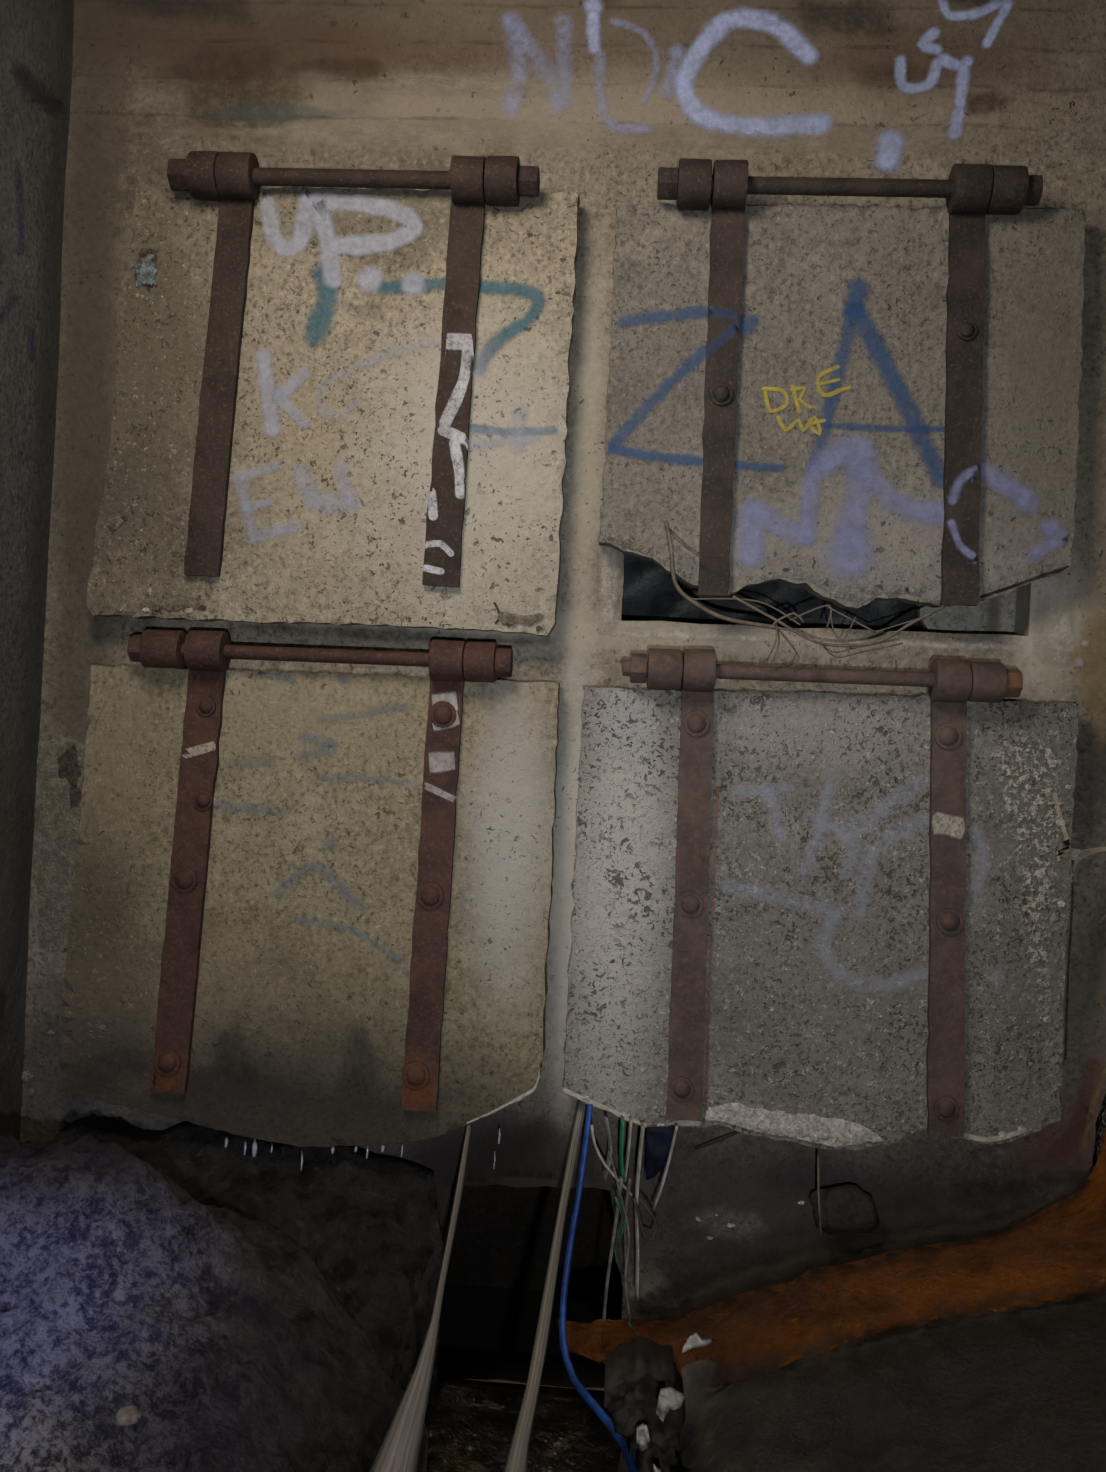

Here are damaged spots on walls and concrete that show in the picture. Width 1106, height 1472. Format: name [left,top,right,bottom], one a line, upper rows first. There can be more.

peeling [600,549,1019,652]
spalling [564,1088,884,1147]